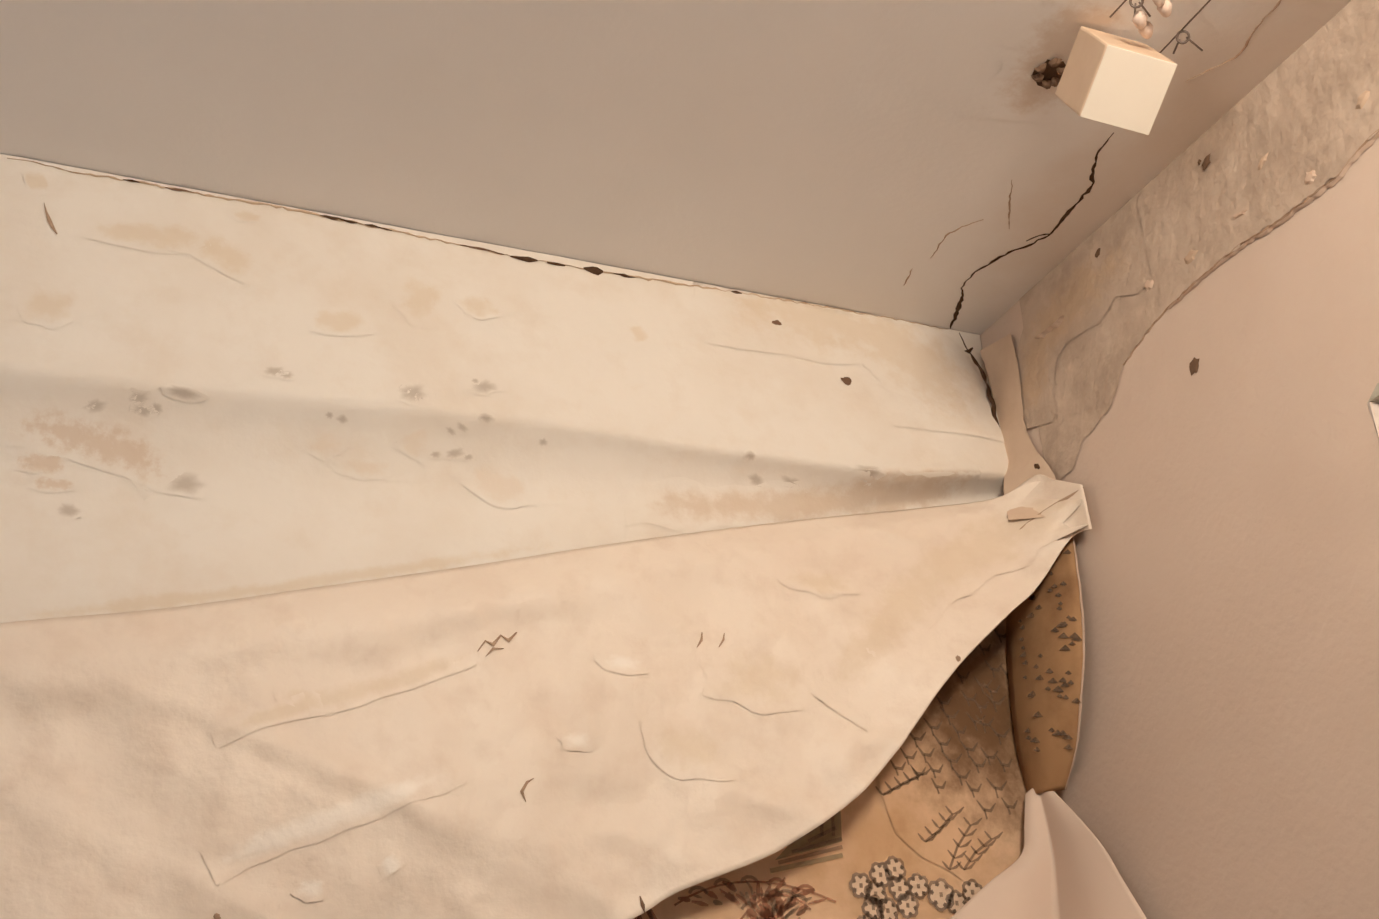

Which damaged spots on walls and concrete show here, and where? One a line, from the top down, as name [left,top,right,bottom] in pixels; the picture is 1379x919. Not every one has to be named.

water stain [87,208,271,284]
crack [7,132,1114,427]
water stain [693,0,1351,443]
flaking render [1019,0,1379,481]
peeling [78,383,210,420]
peeling [428,376,503,462]
peeling [52,500,87,520]
peeling [160,467,214,499]
peeling [742,449,808,493]
water stain [620,453,1089,731]